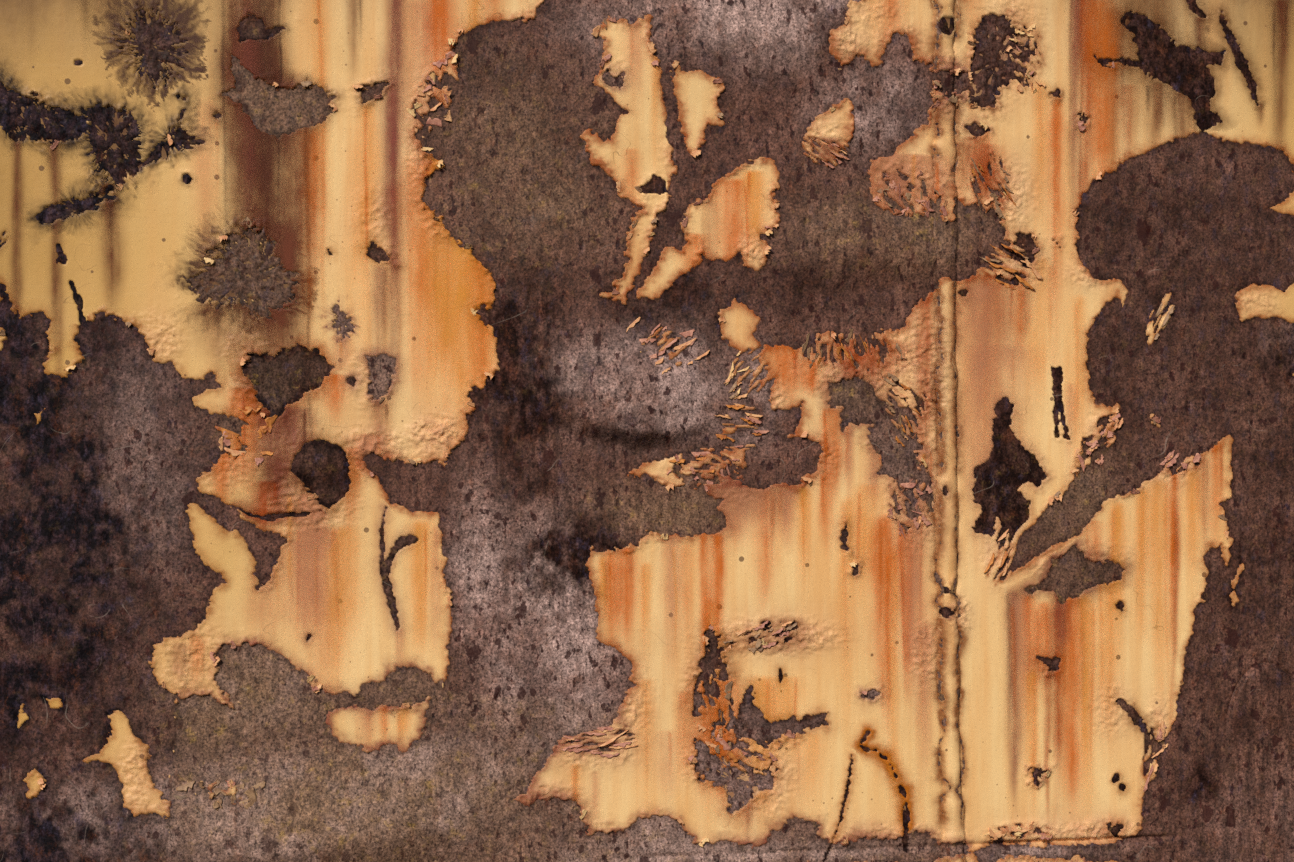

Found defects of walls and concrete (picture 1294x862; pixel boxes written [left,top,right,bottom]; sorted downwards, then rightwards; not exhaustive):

corrosion [0,0,208,281]
corrosion [353,0,402,275]
peeling [414,51,456,152]
corrosion [176,0,355,527]
peeling [215,406,277,466]
corrosion [365,353,396,404]
peeling [626,317,710,374]
peeling [667,351,769,492]
peeling [1077,407,1123,473]
corrosion [688,597,829,814]
corrosion [936,616,966,823]
crack [821,726,914,862]